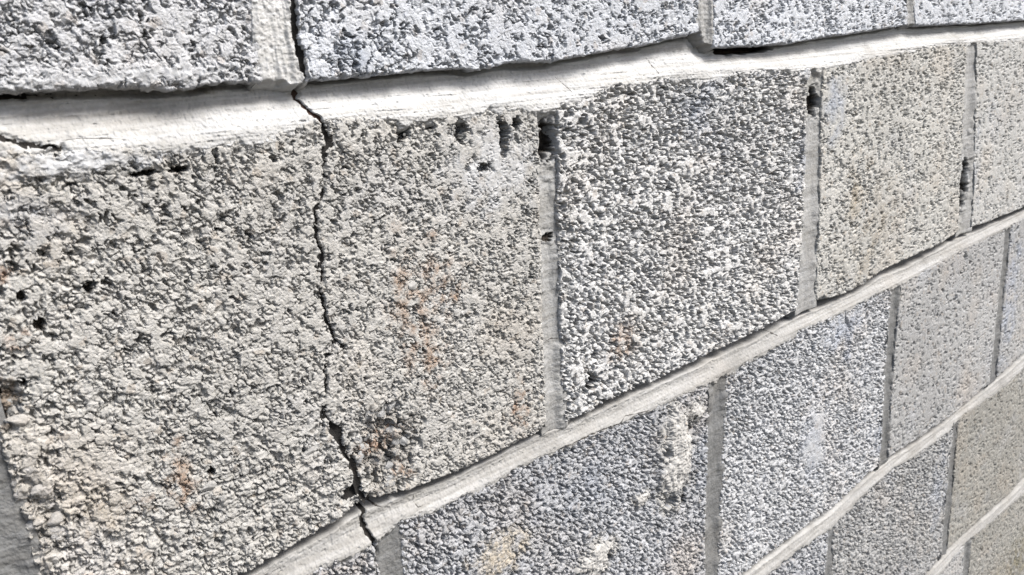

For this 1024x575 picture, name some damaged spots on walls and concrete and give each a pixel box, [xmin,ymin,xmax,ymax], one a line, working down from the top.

crack [290,0,382,552]